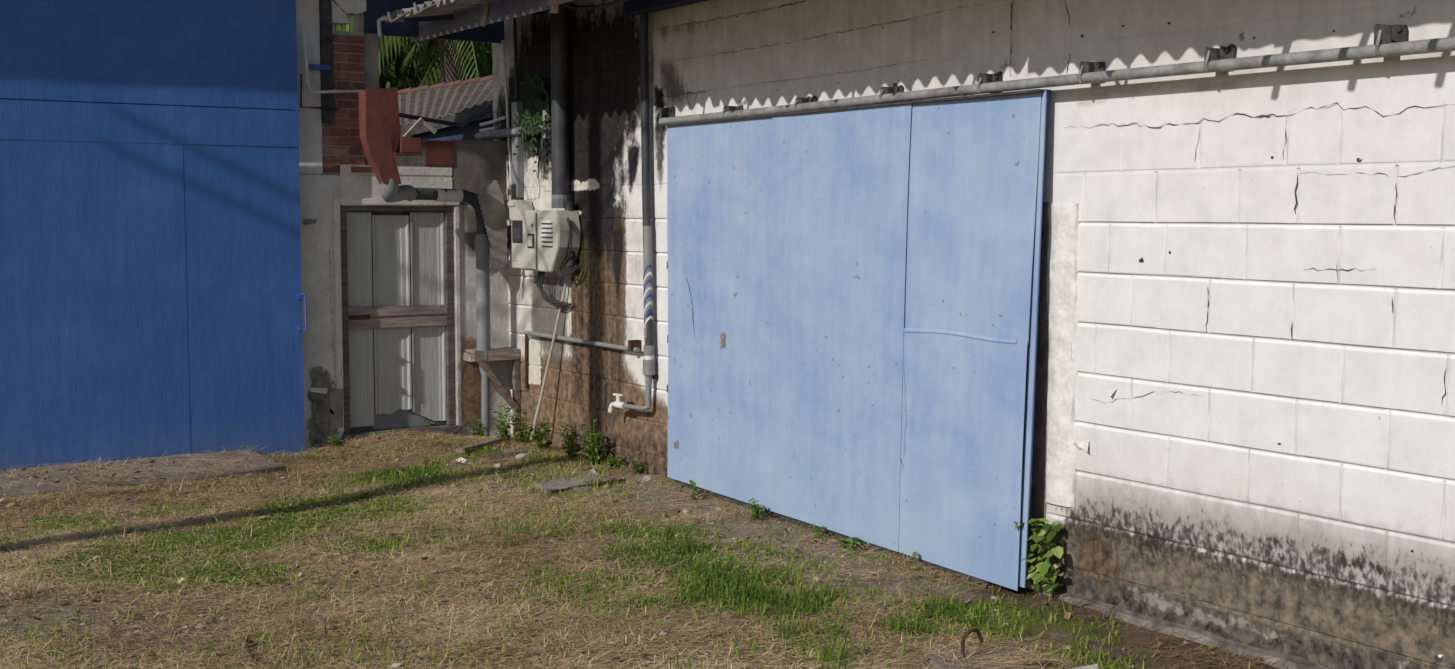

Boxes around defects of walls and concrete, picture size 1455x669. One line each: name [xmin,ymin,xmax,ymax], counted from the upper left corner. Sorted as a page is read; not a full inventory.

peeling [528,156,552,200]
damp [493,1,669,478]
peeling [571,179,600,191]
crack [1069,102,1455,220]
damp [1051,499,1455,669]